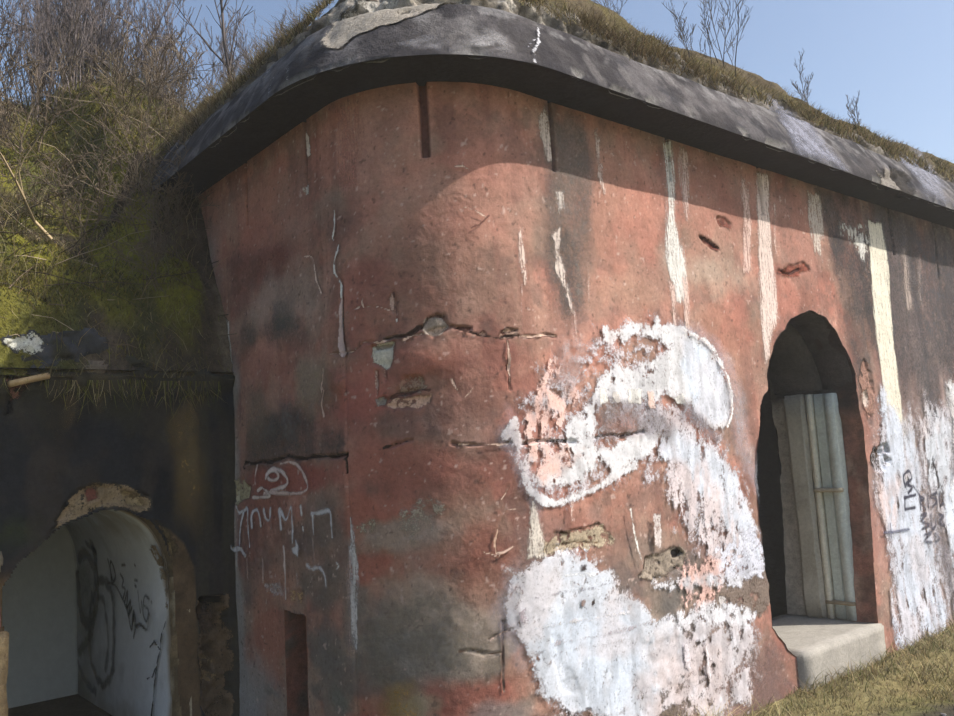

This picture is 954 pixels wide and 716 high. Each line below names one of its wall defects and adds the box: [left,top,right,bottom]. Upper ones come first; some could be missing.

spalling [320,0,463,49]
damp [539,110,606,317]
efflorescence [663,141,690,330]
efflorescence [742,173,778,361]
damp [807,191,954,479]
spalling [372,341,432,409]
crack [243,453,349,474]
spalling [55,483,151,528]
peeling [543,522,615,555]
spalling [639,545,686,581]